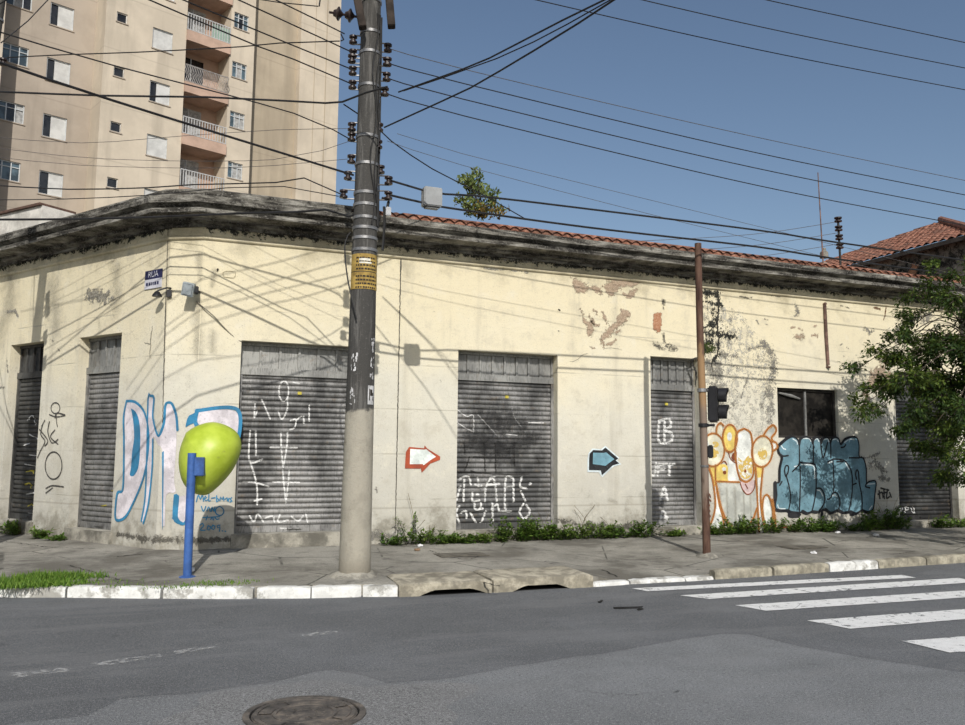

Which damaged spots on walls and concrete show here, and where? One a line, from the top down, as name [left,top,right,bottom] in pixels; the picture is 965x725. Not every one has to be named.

damp [207,227,352,247]
peeling [570,276,639,349]
flaking render [653,312,662,333]
damp [377,245,939,364]
damp [748,339,779,424]